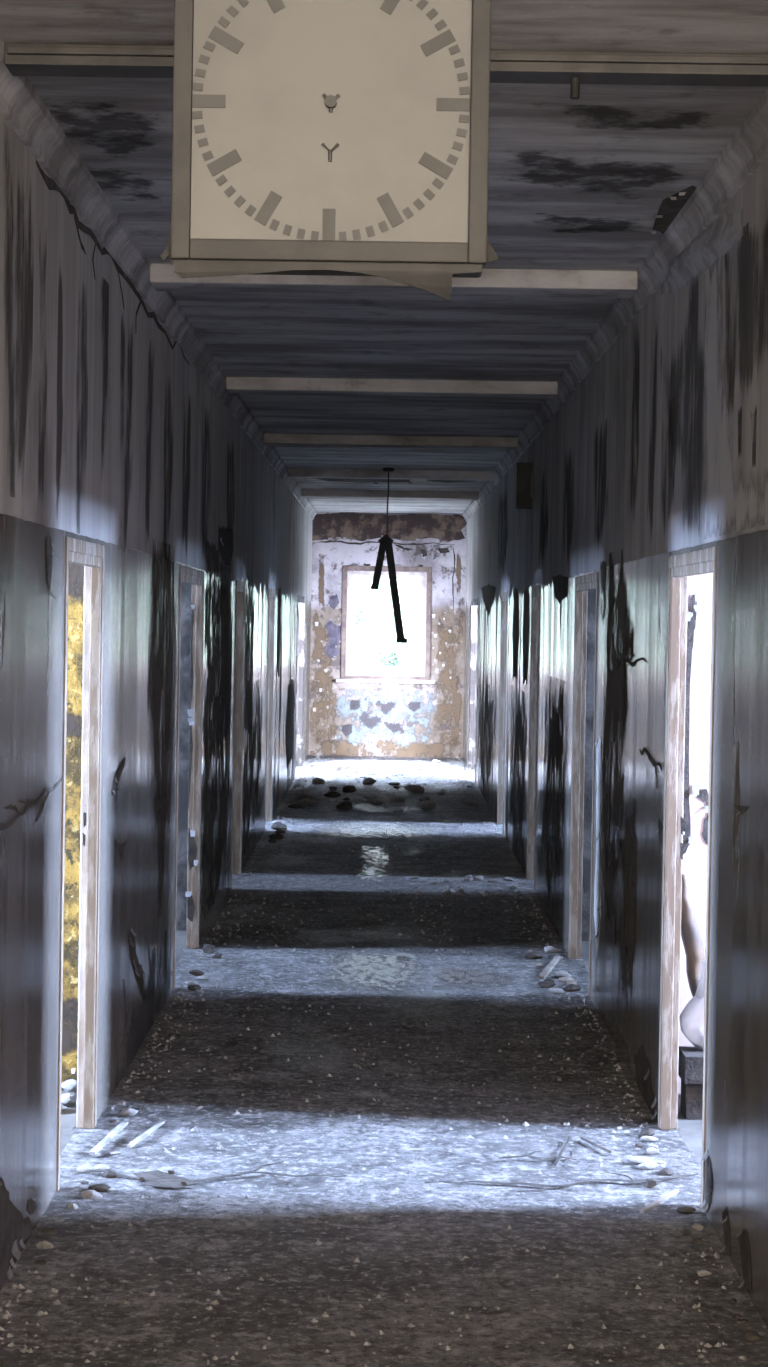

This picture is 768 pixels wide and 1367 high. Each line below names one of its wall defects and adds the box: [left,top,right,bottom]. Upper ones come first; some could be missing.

damp [539,457,574,561]
damp [5,148,235,1077]
peeling [277,586,296,767]
peeling [315,594,342,672]
peeling [313,688,437,747]
damp [594,421,637,1034]